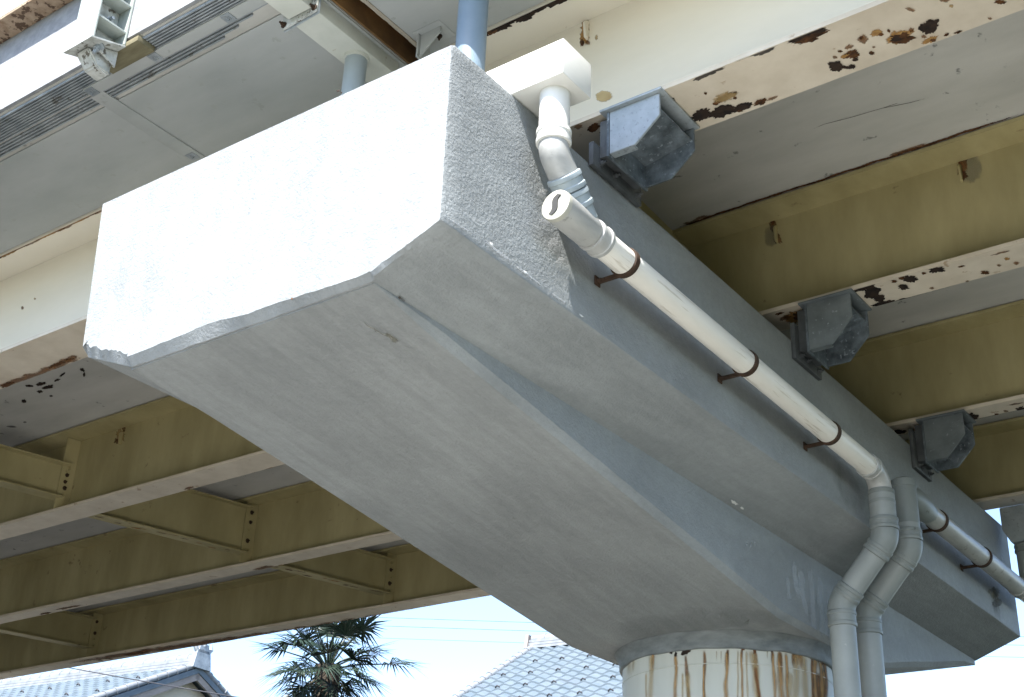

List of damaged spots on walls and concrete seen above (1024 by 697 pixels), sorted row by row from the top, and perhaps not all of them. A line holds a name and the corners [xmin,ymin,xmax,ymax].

peeling [737,28,830,62]
peeling [918,19,939,44]
peeling [827,61,856,72]
peeling [691,96,777,122]
peeling [854,267,954,307]
peeling [22,373,65,403]
corrosion [674,657,690,697]
corrosion [724,650,828,697]